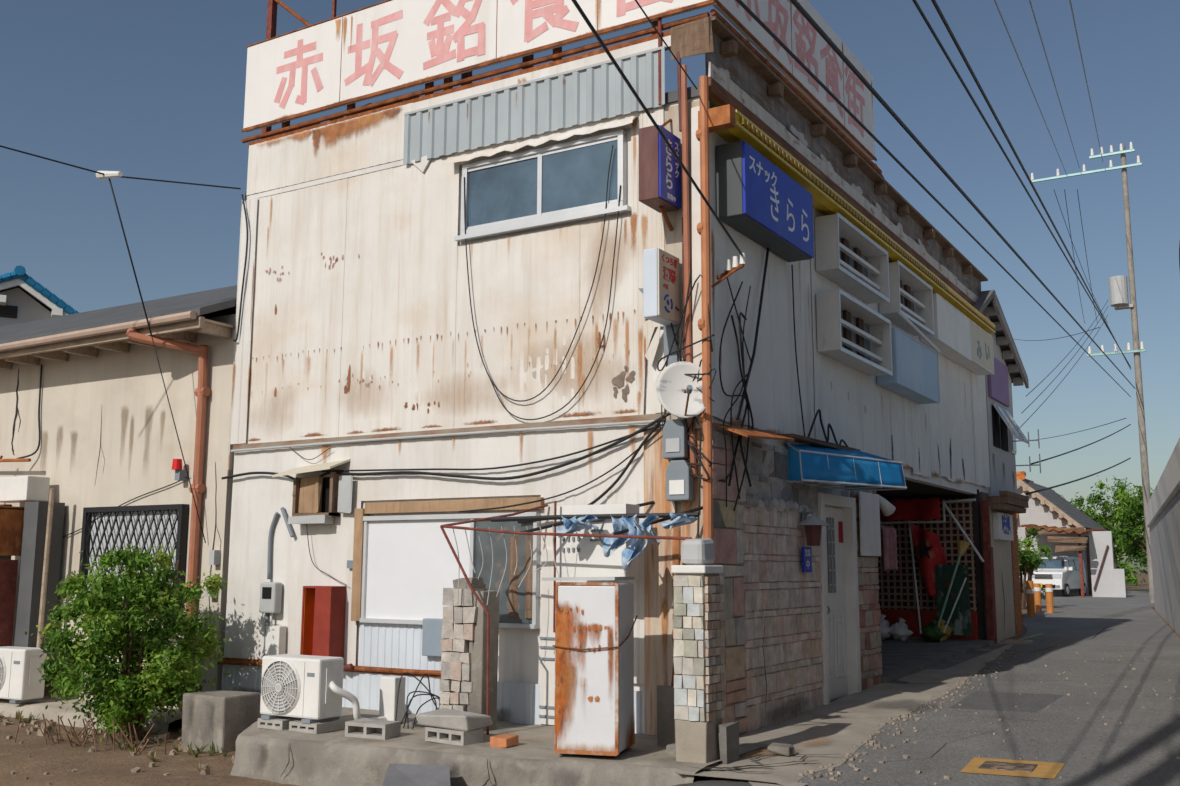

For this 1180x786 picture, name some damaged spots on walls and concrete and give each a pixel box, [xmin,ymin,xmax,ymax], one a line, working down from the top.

corrosion [266,107,400,151]
corrosion [363,309,646,393]